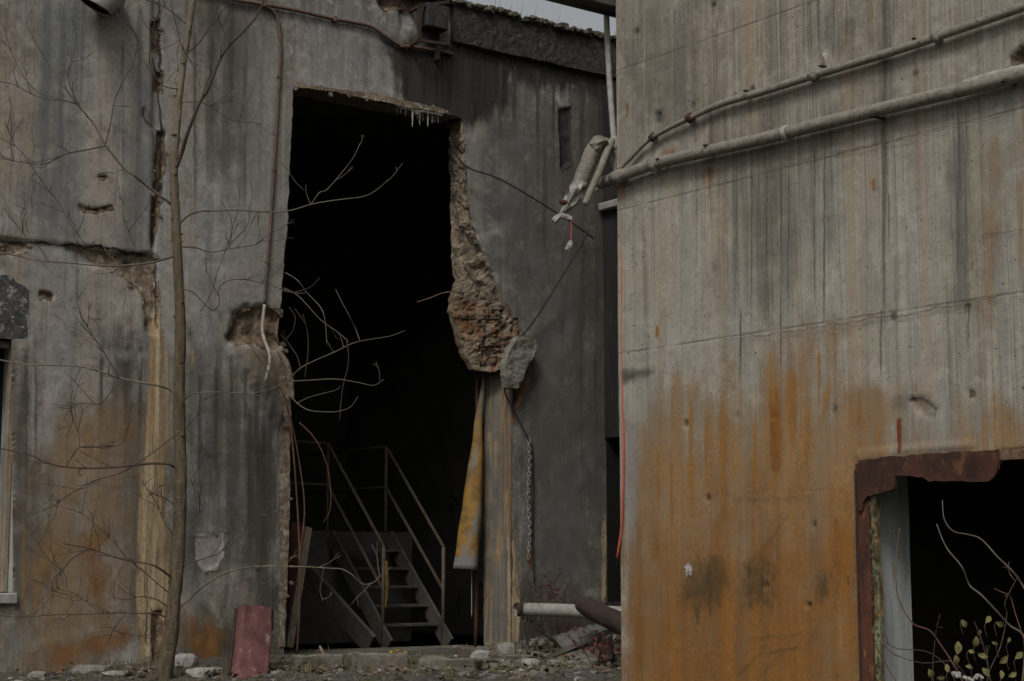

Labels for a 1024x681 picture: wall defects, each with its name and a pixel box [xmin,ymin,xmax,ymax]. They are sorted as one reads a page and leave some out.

spalling [150,14,164,55]
spalling [153,70,163,94]
spalling [38,290,53,301]
spalling [67,131,168,334]
spalling [292,82,522,336]
crack [724,295,999,340]
spalling [226,306,294,647]
corrosion [623,355,934,681]